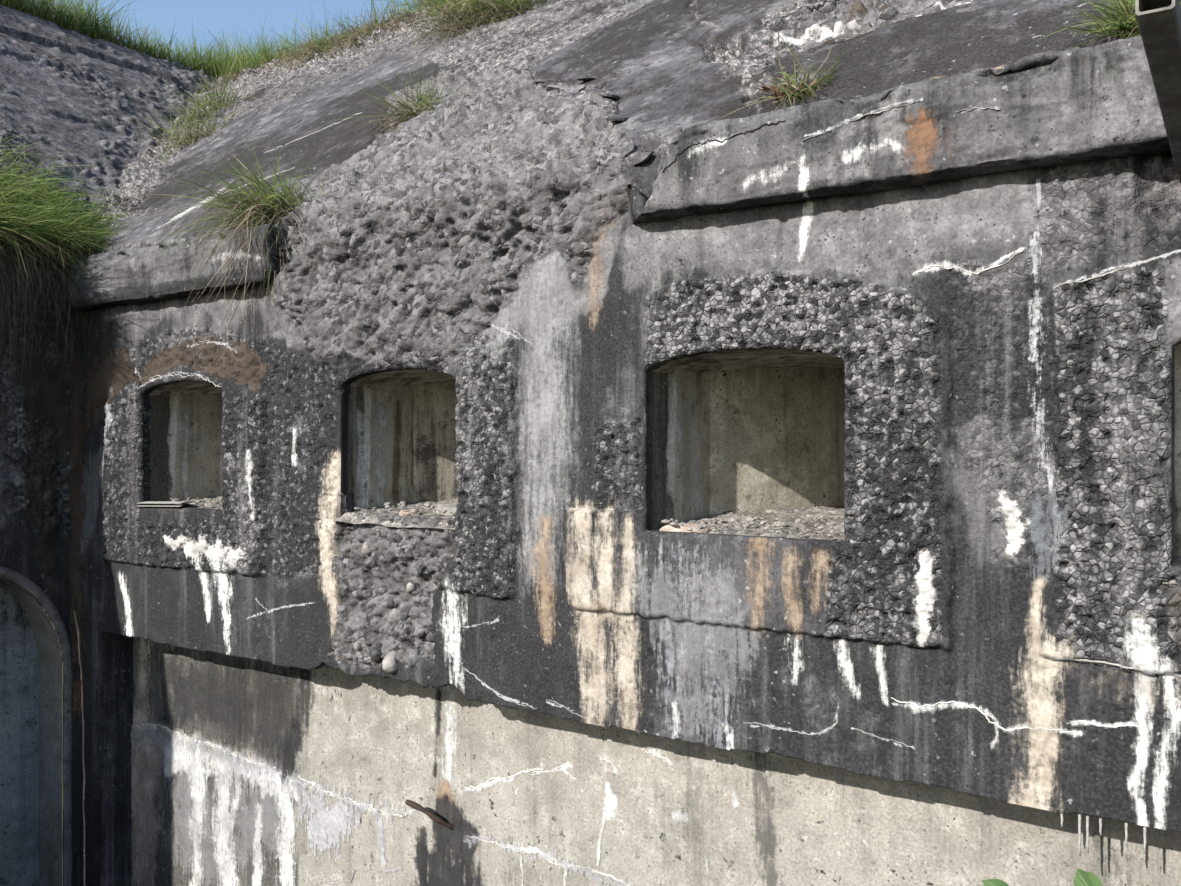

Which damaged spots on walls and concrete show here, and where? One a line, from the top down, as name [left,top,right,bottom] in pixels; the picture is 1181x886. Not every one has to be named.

corrosion [905,107,940,179]
crack [1053,249,1181,289]
damp [782,551,829,682]
damp [118,534,416,886]
damp [415,581,518,886]
crack [750,703,915,749]
damp [838,640,861,697]
damp [876,645,888,704]
crack [891,697,1139,744]
damp [1125,613,1181,829]
crack [133,723,417,817]
crack [464,762,577,791]